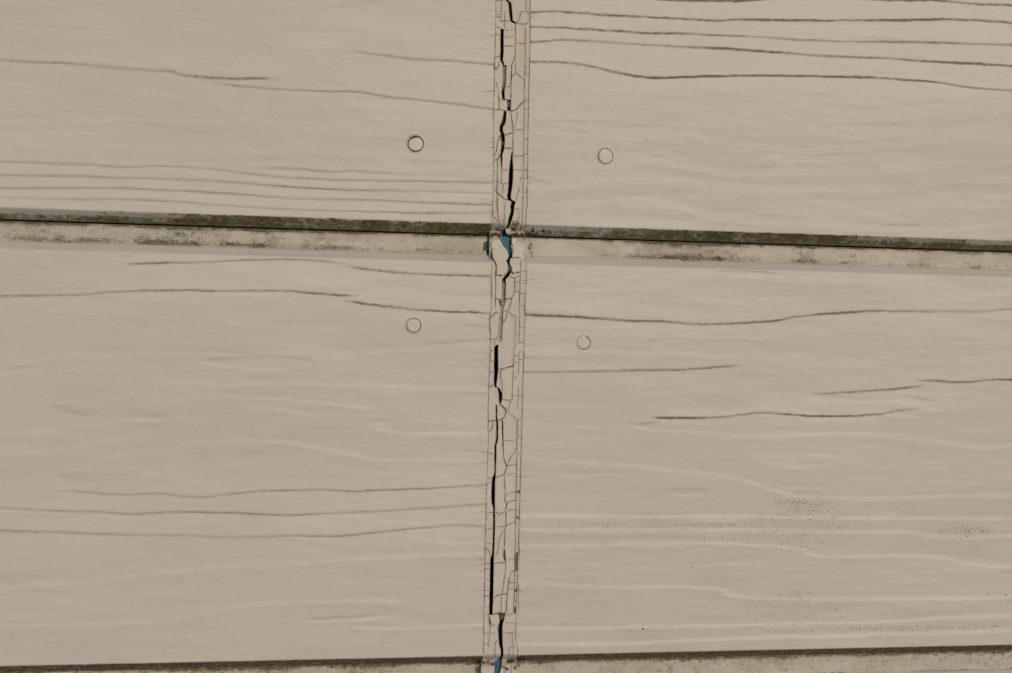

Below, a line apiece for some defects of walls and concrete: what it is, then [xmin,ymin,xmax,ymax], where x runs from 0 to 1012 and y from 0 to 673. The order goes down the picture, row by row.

peeling [491,228,523,276]
crack [483,0,531,668]